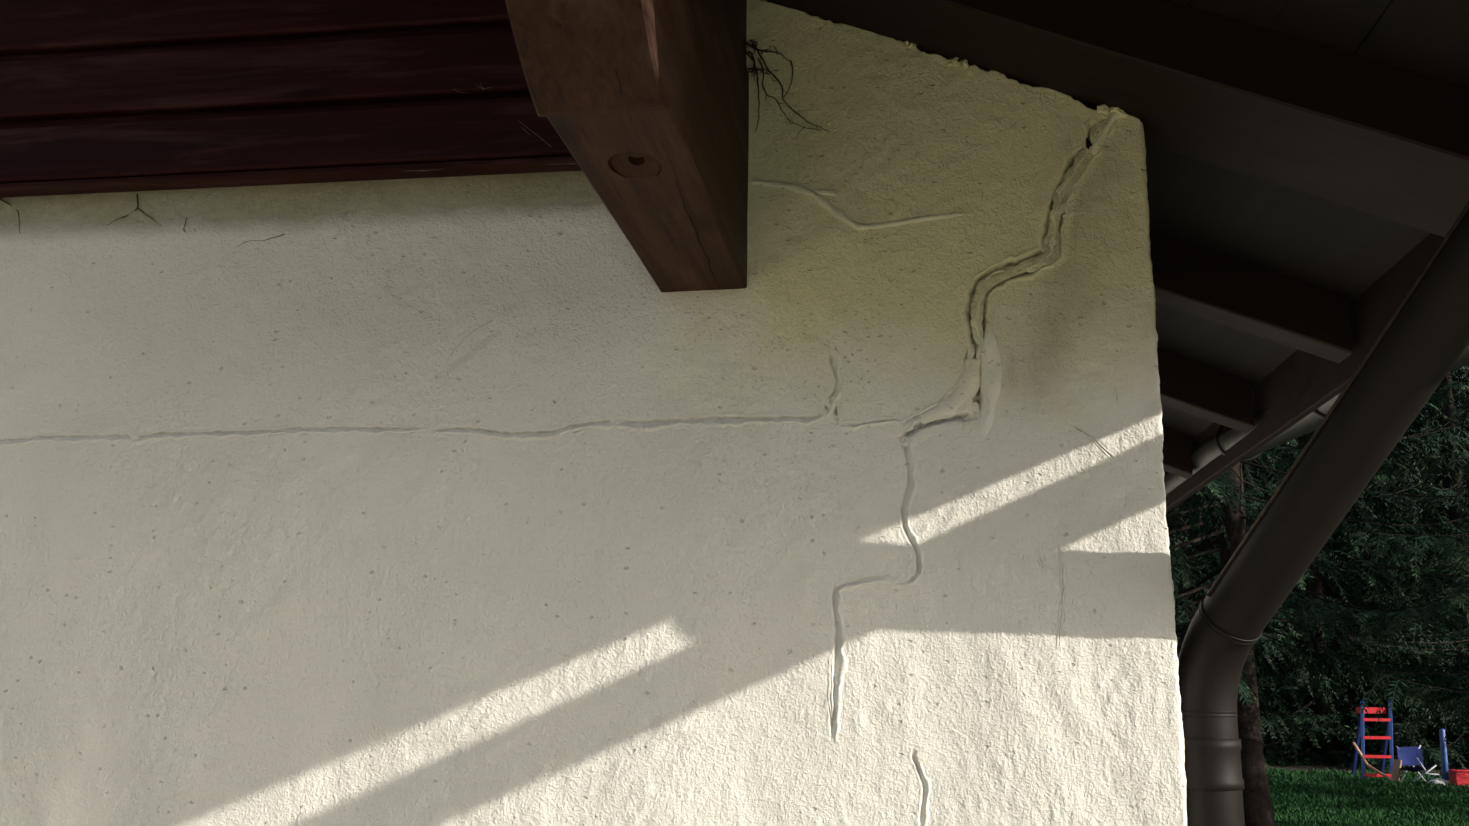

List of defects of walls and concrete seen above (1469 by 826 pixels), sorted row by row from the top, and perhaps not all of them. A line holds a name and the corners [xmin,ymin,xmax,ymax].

crack [0,112,1121,743]
crack [907,748,931,826]